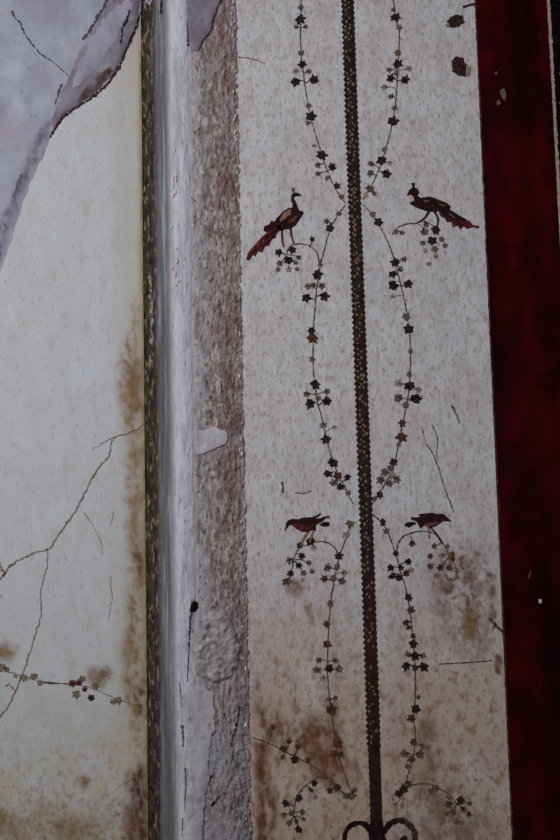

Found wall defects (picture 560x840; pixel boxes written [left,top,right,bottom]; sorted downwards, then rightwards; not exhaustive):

spalling [49,0,145,138]
spalling [445,14,465,28]
spalling [451,56,470,77]
crack [0,423,144,717]
water stain [124,485,143,718]
water stain [438,553,481,643]